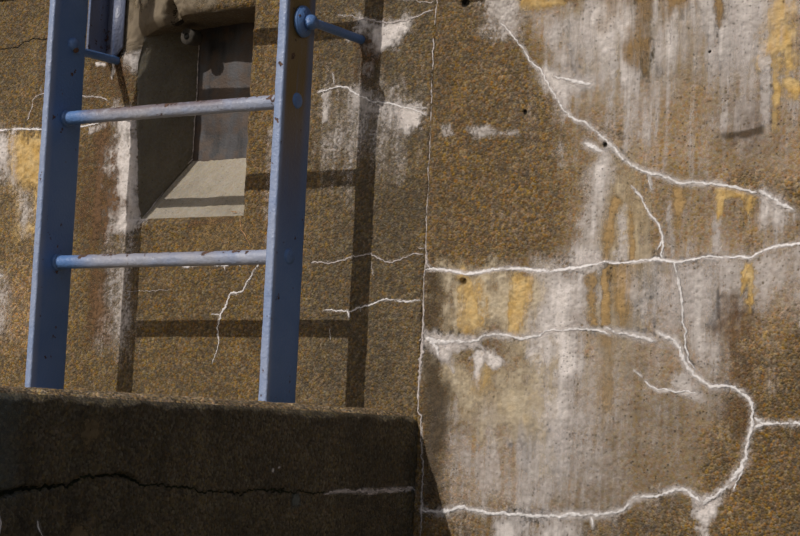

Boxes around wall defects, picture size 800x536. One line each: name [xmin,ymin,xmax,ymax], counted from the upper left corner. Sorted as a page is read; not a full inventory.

crack [0,93,44,131]
damp [6,131,41,243]
crack [1,38,48,50]
efflorescence [89,120,146,234]
crack [188,45,200,164]
crack [318,38,434,230]
damp [584,152,660,331]
crack [500,23,795,211]
damp [715,186,755,219]
damp [725,0,800,138]
crack [0,187,800,535]
damp [423,256,576,536]